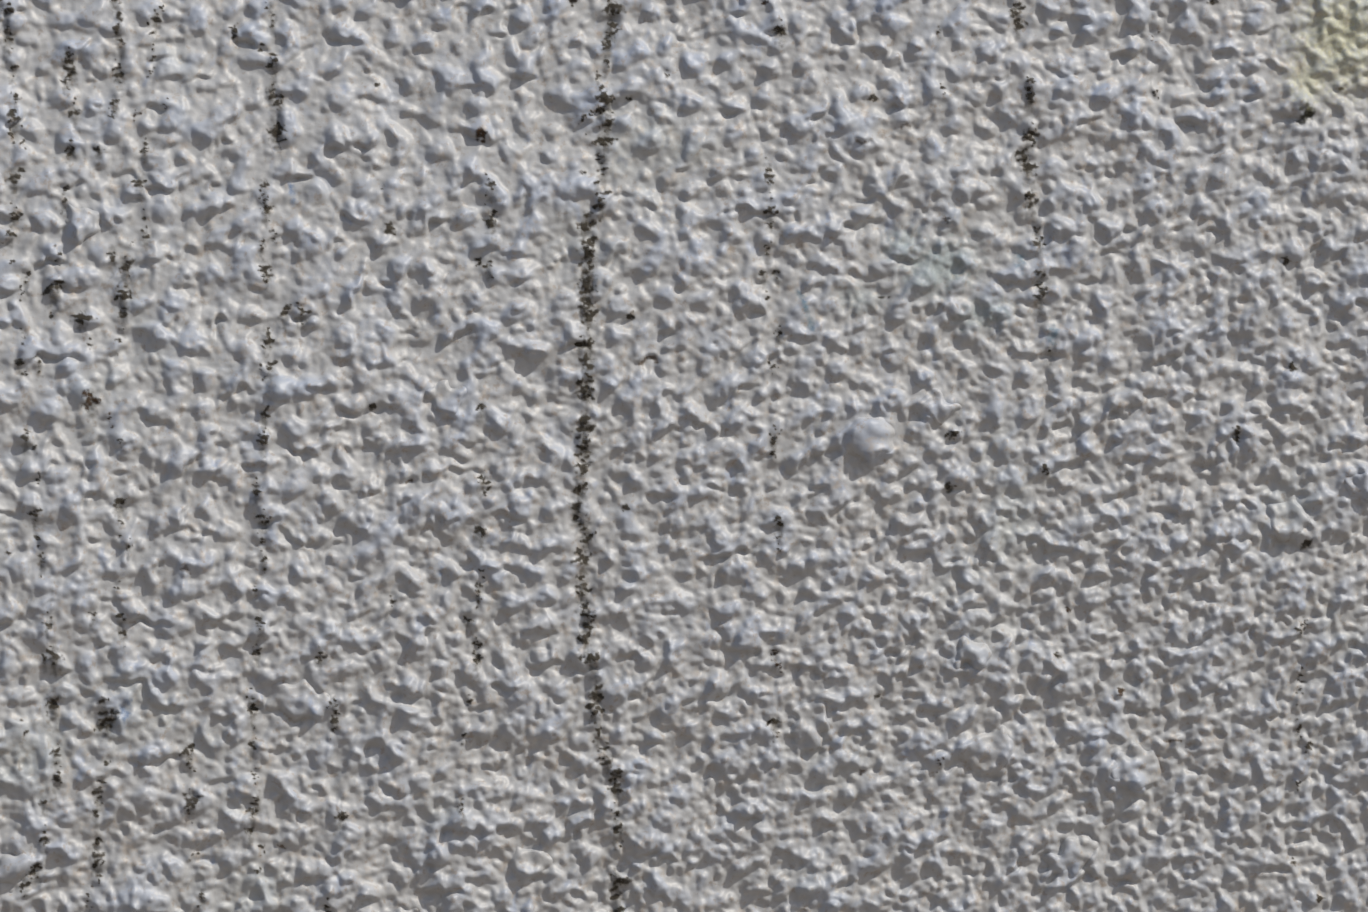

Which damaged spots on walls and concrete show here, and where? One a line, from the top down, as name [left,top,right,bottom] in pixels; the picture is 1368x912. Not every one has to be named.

water stain [1010,3,1028,29]
water stain [0,0,26,149]
water stain [60,47,80,116]
water stain [258,7,286,142]
water stain [1015,122,1039,176]
water stain [71,314,92,346]
water stain [107,252,134,342]
water stain [259,328,278,381]
water stain [571,0,632,664]
water stain [82,391,123,443]
water stain [585,684,623,847]
water stain [609,874,632,912]